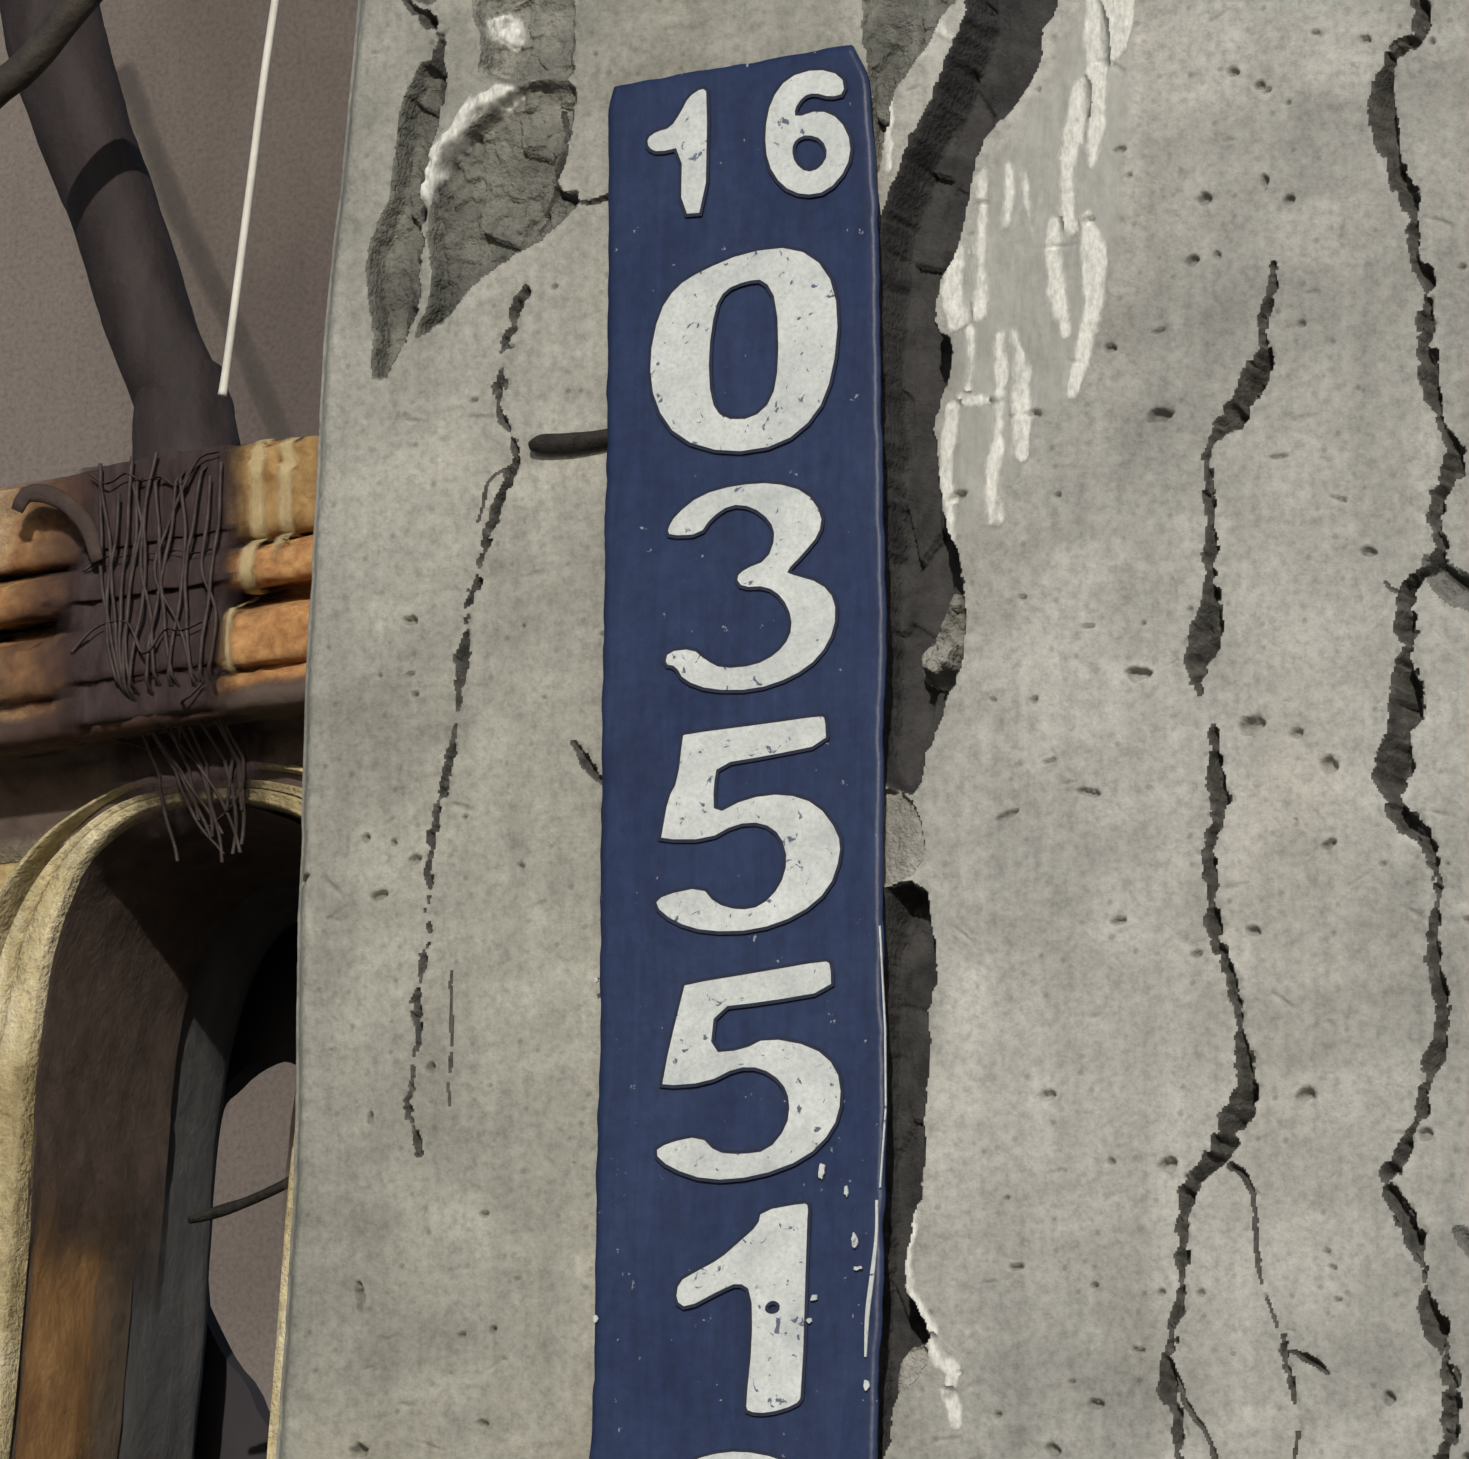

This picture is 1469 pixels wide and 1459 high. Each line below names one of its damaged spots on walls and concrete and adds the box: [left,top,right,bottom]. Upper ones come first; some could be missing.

crack [403,180,428,345]
crack [401,0,448,130]
spalling [365,0,579,380]
crack [535,111,608,237]
leakage [884,101,895,172]
leakage [935,21,953,40]
leakage [939,0,1135,544]
crack [403,284,531,1158]
crack [570,740,603,785]
crack [1367,0,1469,1459]
crack [1156,260,1330,1459]